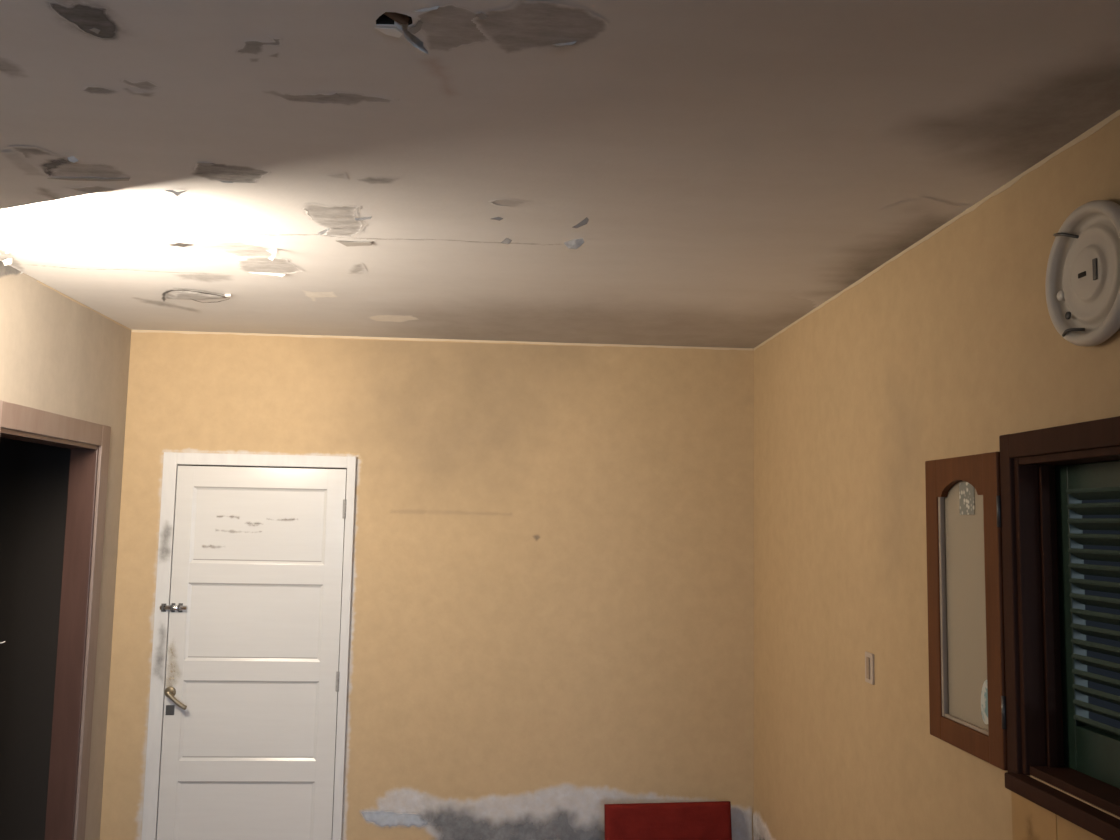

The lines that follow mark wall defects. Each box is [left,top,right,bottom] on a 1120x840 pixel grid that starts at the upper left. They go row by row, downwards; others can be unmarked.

peeling [35,0,140,44]
peeling [370,0,609,56]
peeling [259,89,400,107]
peeling [0,146,304,280]
peeling [300,202,372,247]